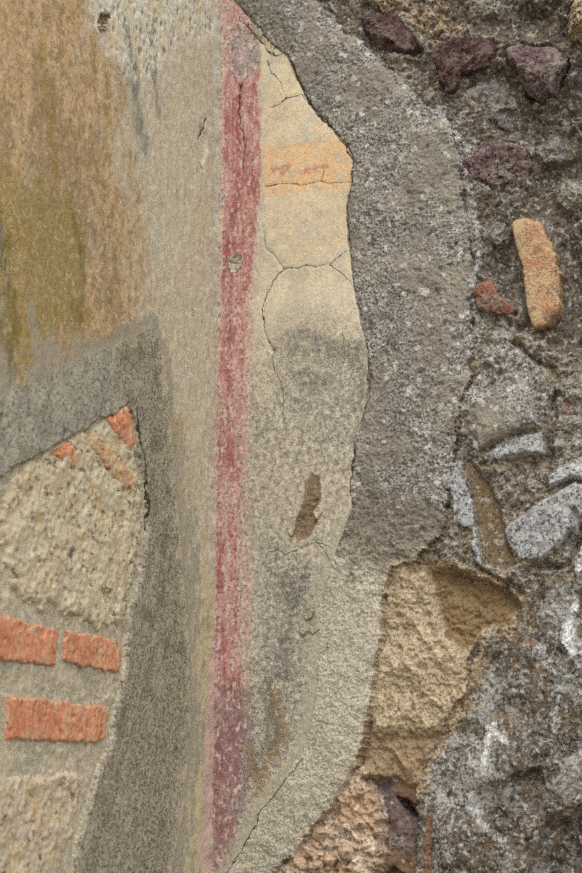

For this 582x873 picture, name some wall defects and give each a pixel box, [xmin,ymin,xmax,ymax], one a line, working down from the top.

crack [234,75,248,171]
crack [239,17,355,444]
crack [349,342,370,504]
spalling [288,472,323,543]
spalling [0,406,149,873]
spalling [273,561,519,873]
crack [226,759,302,873]